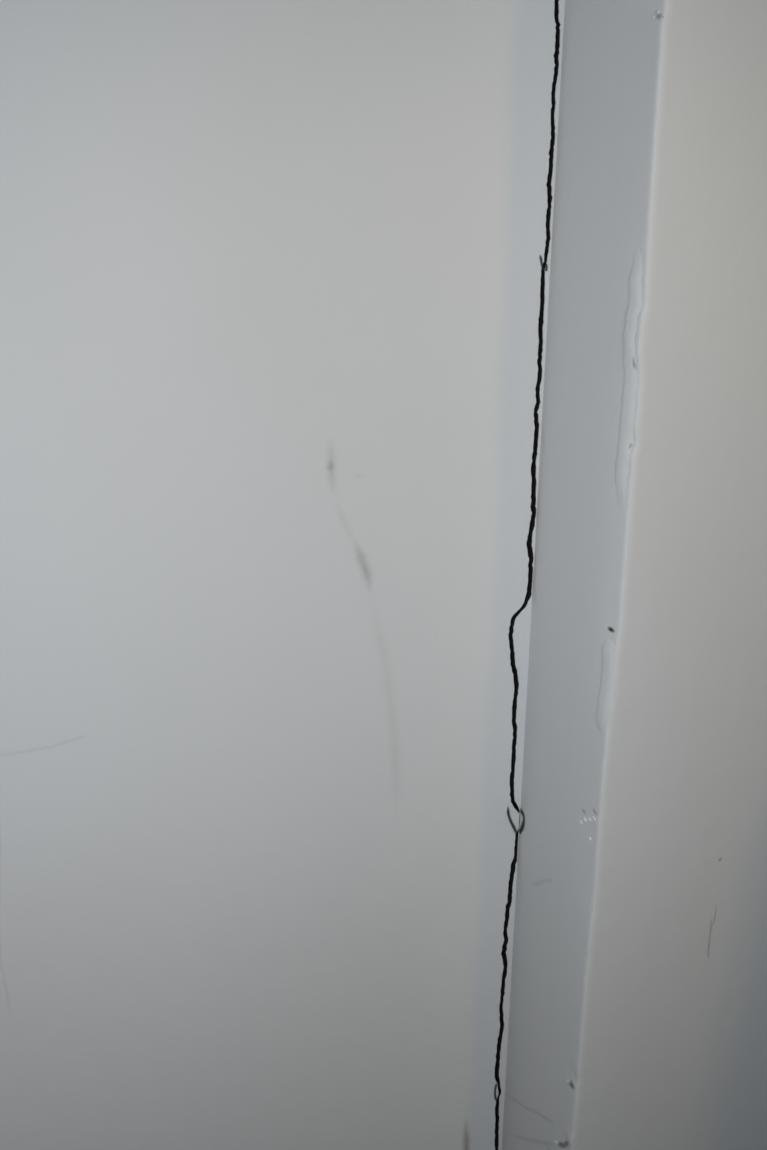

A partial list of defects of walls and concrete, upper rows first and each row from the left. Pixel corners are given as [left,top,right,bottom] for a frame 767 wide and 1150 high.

crack [494,0,560,1150]